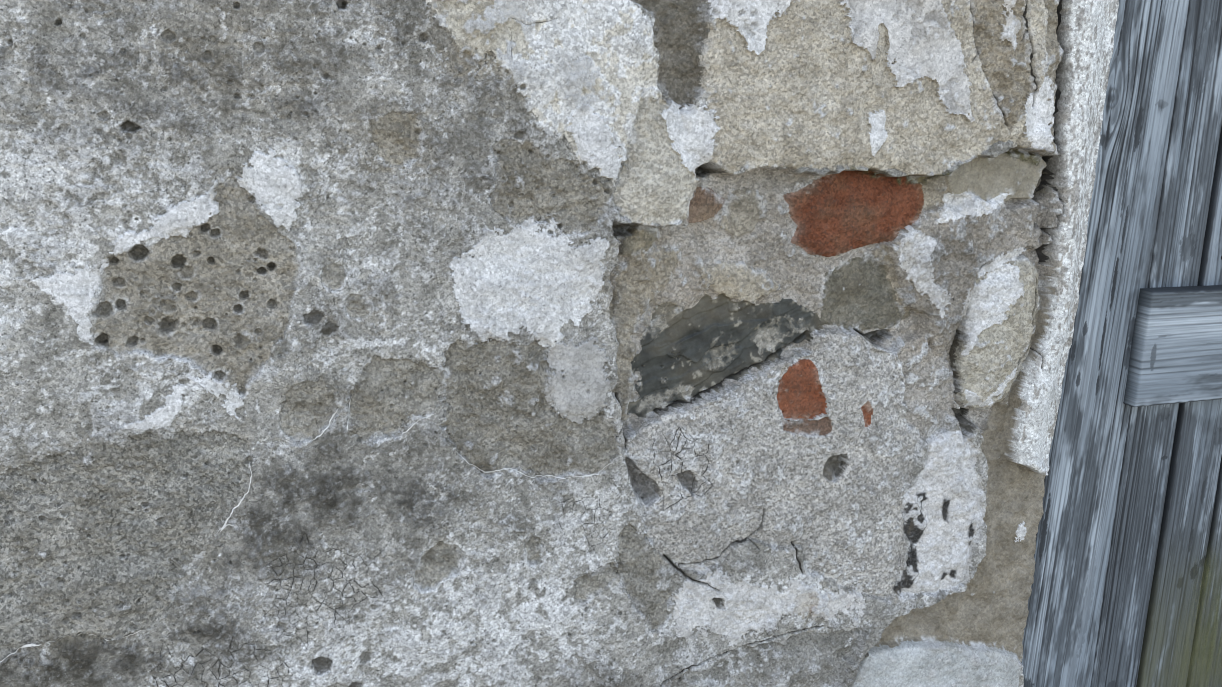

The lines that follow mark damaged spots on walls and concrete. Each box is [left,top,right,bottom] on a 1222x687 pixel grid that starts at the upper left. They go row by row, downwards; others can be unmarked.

flaking render [0,148,302,662]
flaking render [280,0,1064,662]
crack [663,515,763,591]